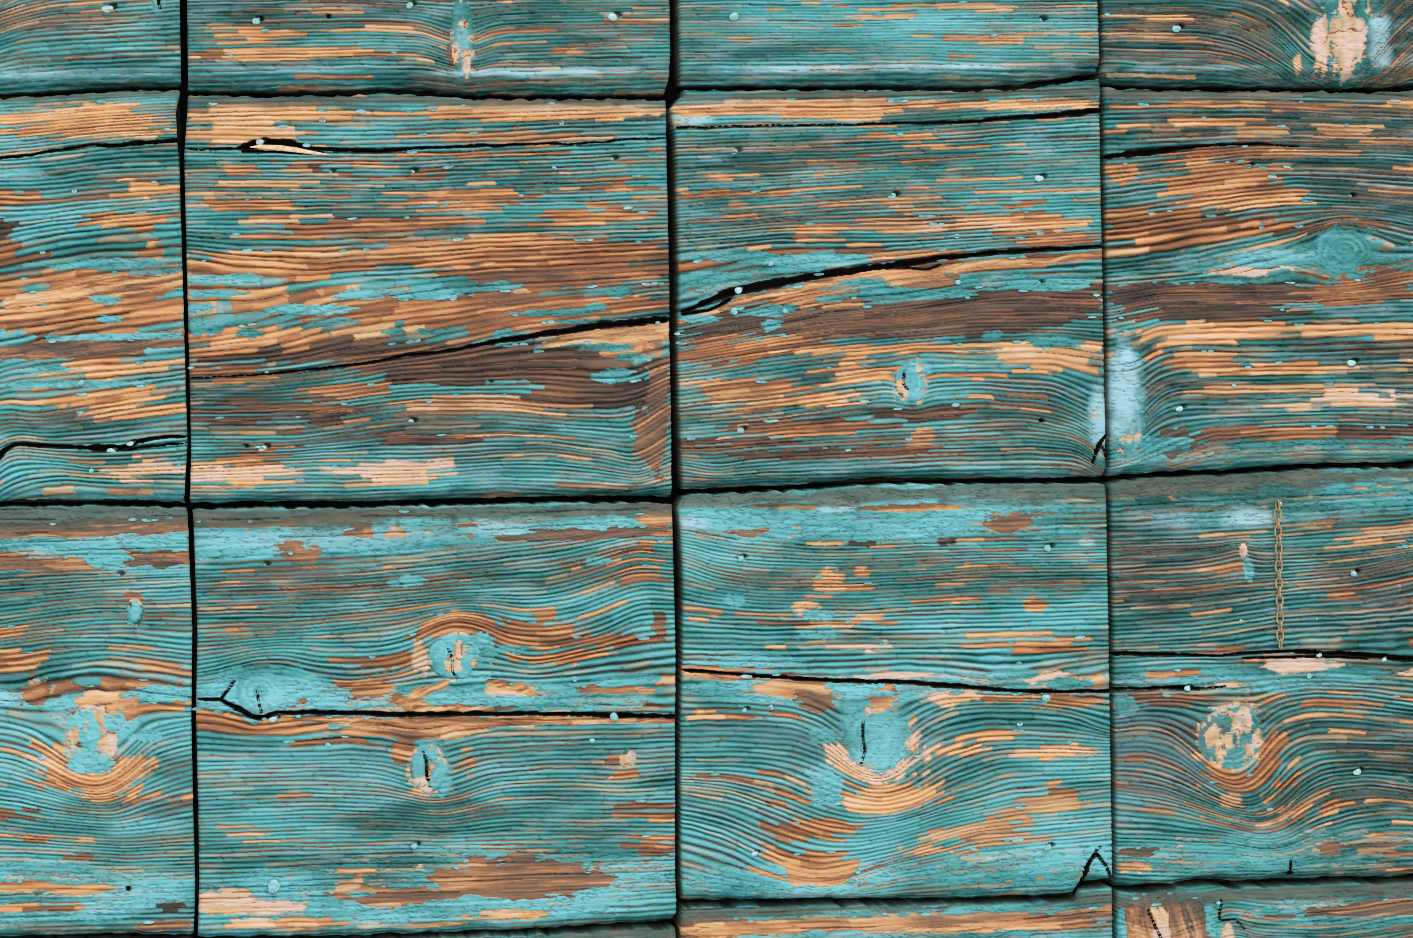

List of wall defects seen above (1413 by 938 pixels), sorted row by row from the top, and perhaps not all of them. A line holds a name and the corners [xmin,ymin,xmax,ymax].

peeling [190,26,417,62]
peeling [1294,0,1367,83]
crack [190,244,1102,379]
peeling [0,97,1413,489]
crack [0,434,186,460]
peeling [0,611,754,804]
crack [422,752,430,787]
crack [197,649,676,721]
crack [859,721,867,766]
peeling [682,631,1108,887]
crack [683,649,1413,694]
peeling [680,892,1413,938]